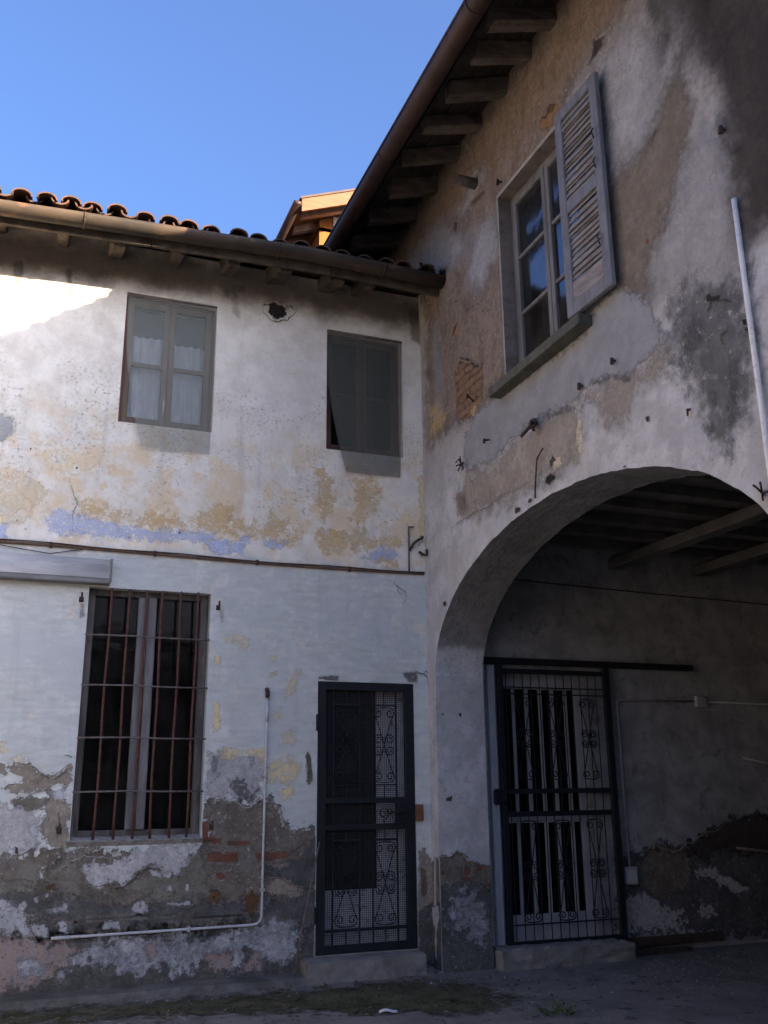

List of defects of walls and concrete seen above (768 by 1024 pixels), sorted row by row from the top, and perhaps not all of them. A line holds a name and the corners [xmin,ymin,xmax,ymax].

peeling [382,0,628,446]
hole [262,301,297,322]
peeling [456,344,673,520]
water stain [667,283,758,457]
peeling [48,498,298,554]
peeling [315,468,401,569]
spalling [0,730,316,995]
spalling [418,848,494,973]
spalling [613,809,768,940]